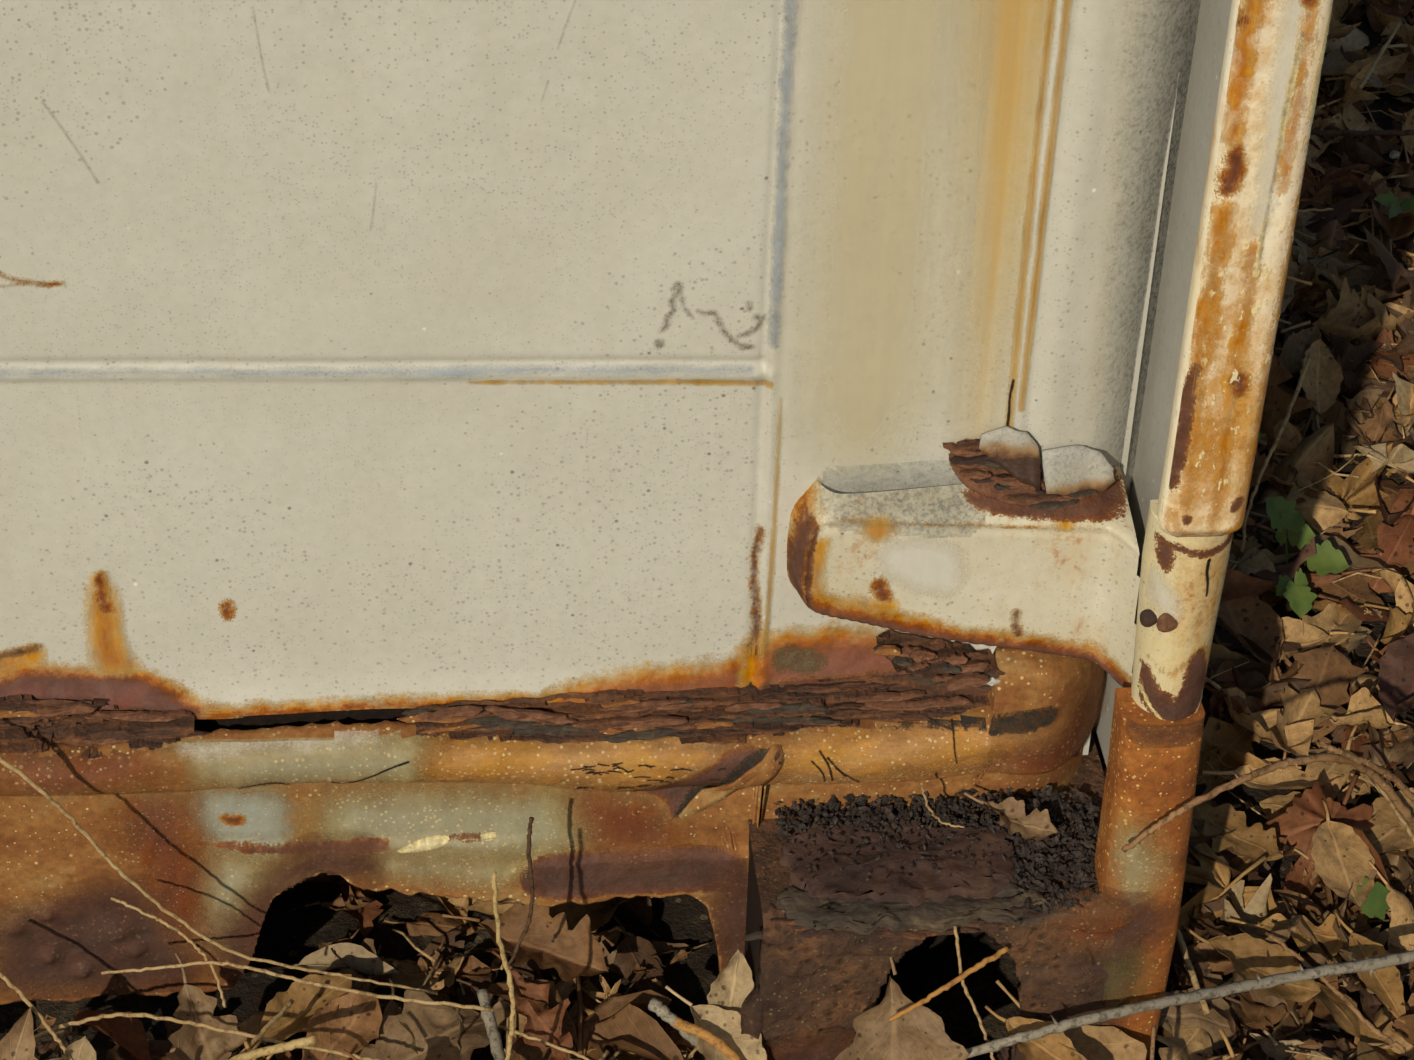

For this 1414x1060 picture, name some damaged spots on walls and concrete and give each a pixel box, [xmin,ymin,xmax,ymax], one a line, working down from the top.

rust [977,0,1071,428]
rust [1154,0,1272,573]
rust [1269,0,1319,335]
rust [0,423,1133,999]
rust [1100,895,1165,1028]